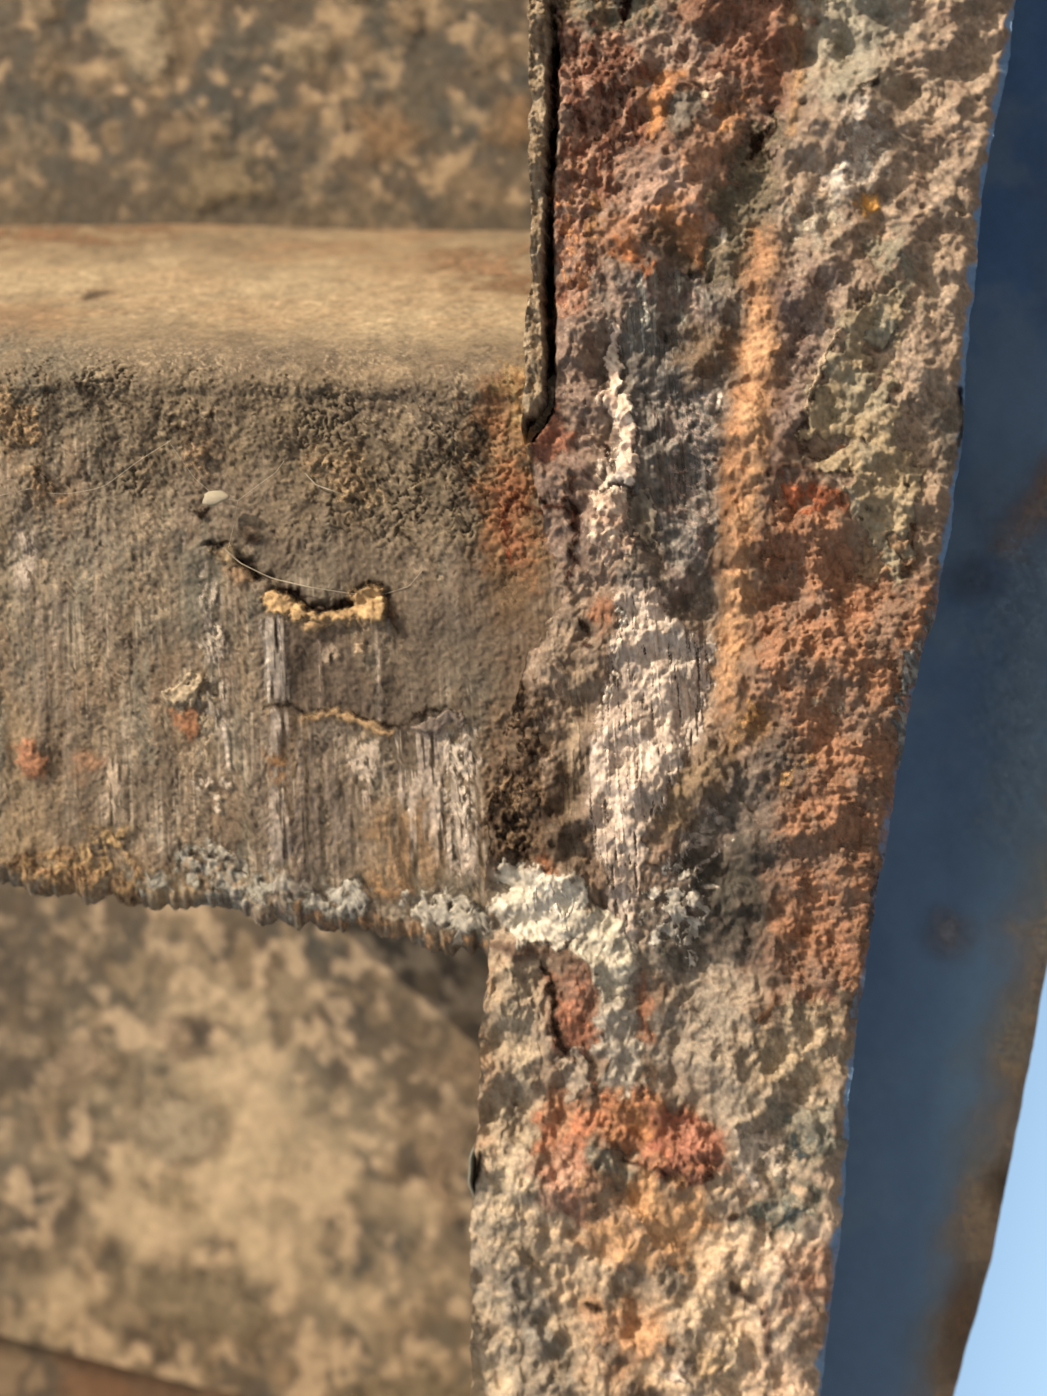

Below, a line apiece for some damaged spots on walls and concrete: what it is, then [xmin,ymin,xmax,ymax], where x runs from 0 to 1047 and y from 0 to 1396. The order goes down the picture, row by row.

crack [527,12,566,446]
rust [549,0,816,337]
crack [207,540,399,634]
crack [264,701,465,736]
rust [471,364,547,617]
crack [559,499,592,648]
leakage [596,590,724,902]
rust [714,229,940,1016]
crack [540,940,593,1063]
rust [547,962,605,1059]
rust [530,1066,731,1271]
rust [578,1295,667,1396]